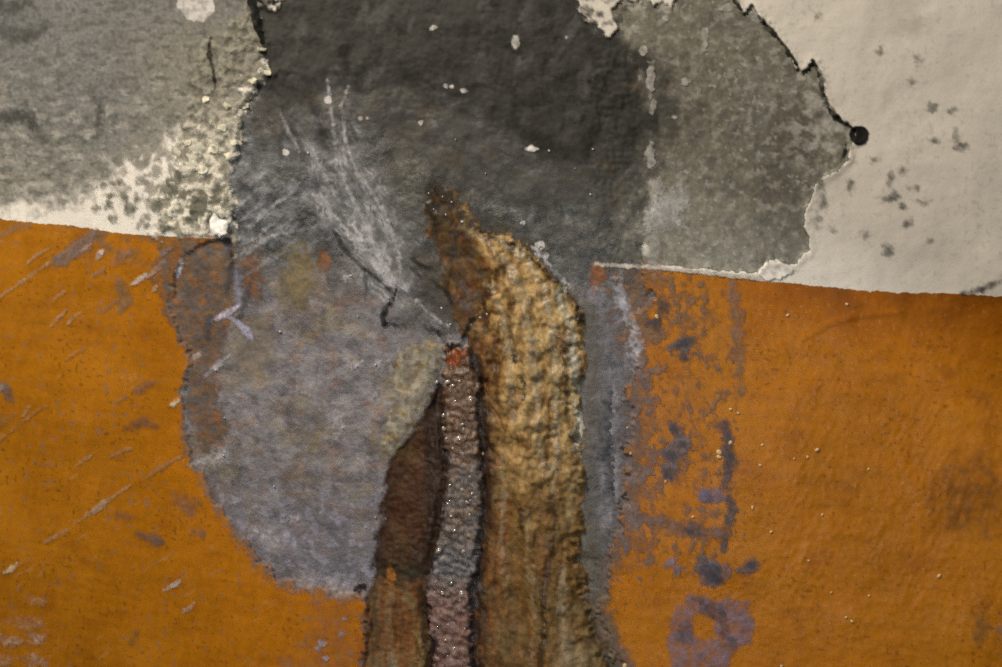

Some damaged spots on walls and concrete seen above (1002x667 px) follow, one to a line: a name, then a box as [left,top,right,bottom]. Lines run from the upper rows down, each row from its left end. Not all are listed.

damp [0,0,678,667]
crack [380,288,397,327]
spalling [149,0,856,667]
damp [644,183,689,230]
rust [353,378,447,667]